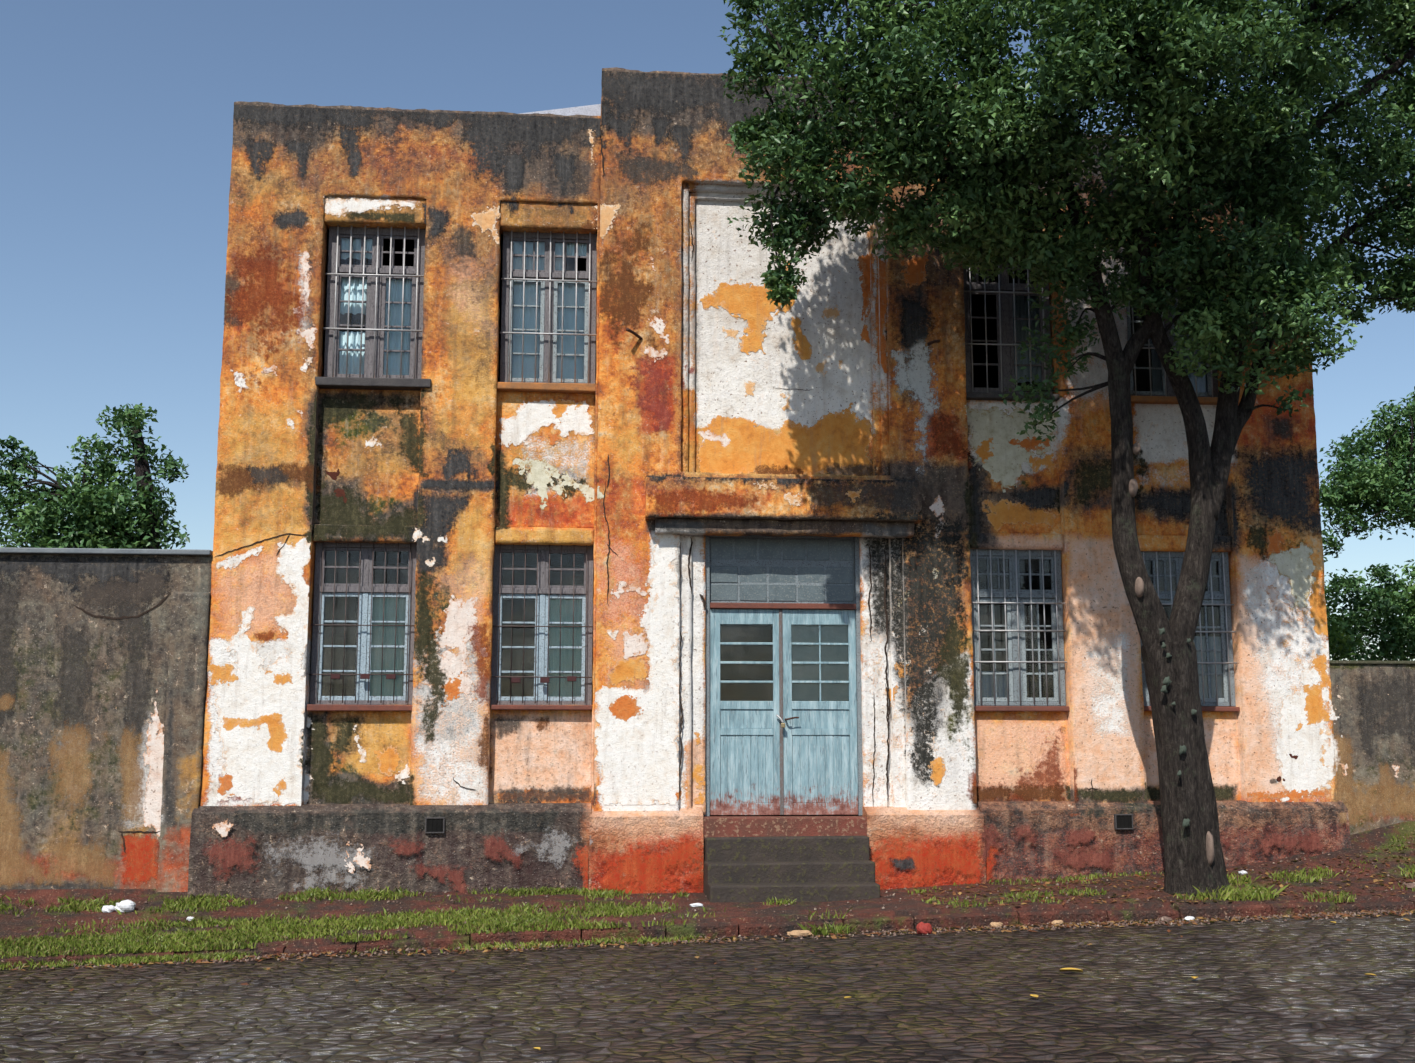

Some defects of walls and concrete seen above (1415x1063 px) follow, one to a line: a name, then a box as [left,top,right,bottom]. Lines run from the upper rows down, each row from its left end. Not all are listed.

leakage [233,71,946,214]
leakage [216,388,599,678]
peeling [498,398,604,510]
peeling [700,279,843,377]
peeling [697,387,879,476]
leakage [645,296,993,791]
leakage [1214,418,1322,560]
leakage [104,600,164,837]
peeling [207,533,315,806]
leakage [300,714,414,805]
peeling [496,534,705,805]
peeling [1236,530,1343,802]